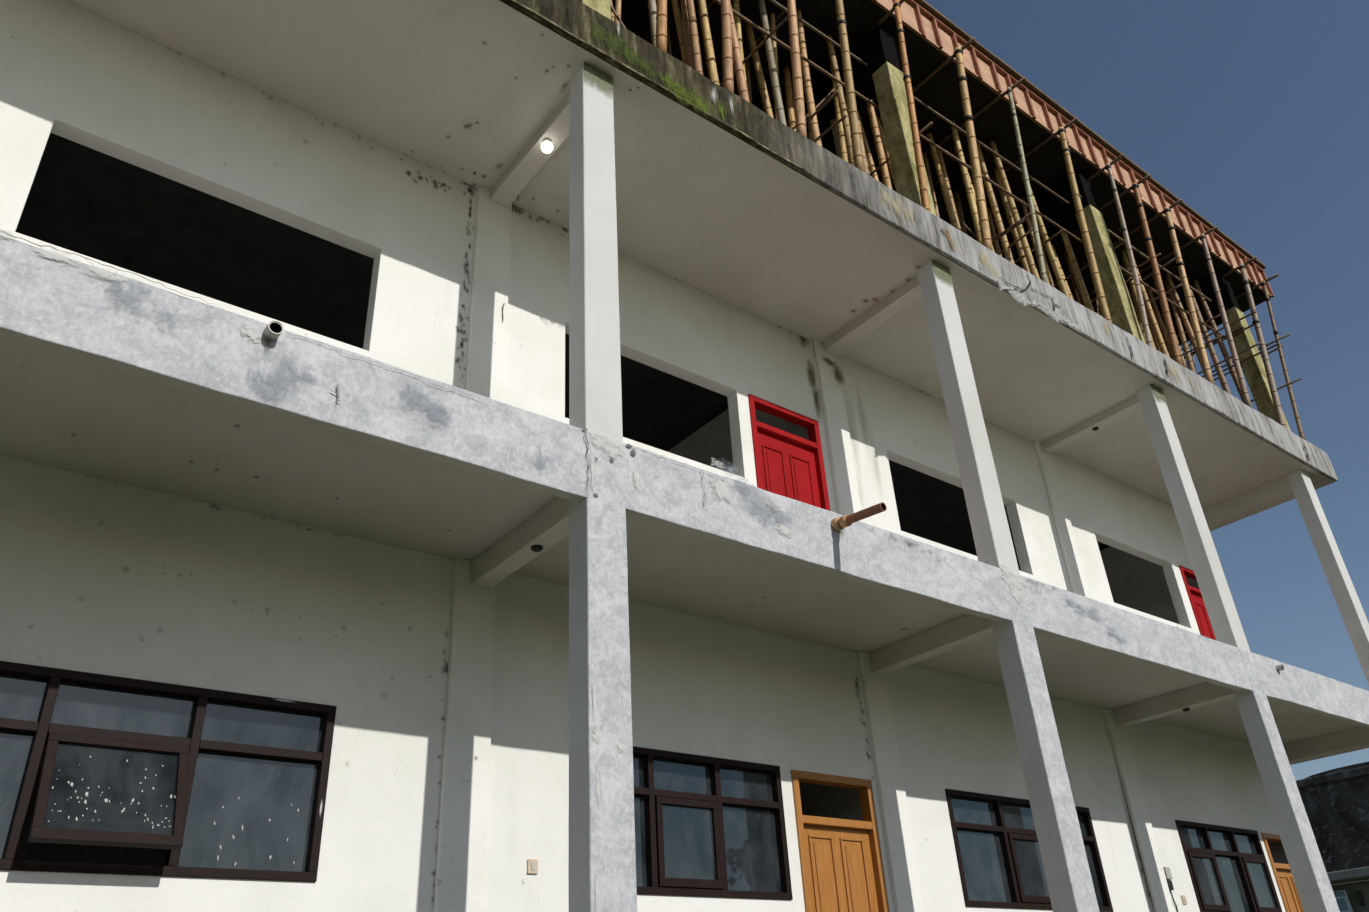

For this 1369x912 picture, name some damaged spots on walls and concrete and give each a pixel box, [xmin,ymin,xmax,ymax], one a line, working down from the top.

crack [0,230,224,310]
leakage [405,151,500,377]
crack [1000,274,1061,311]